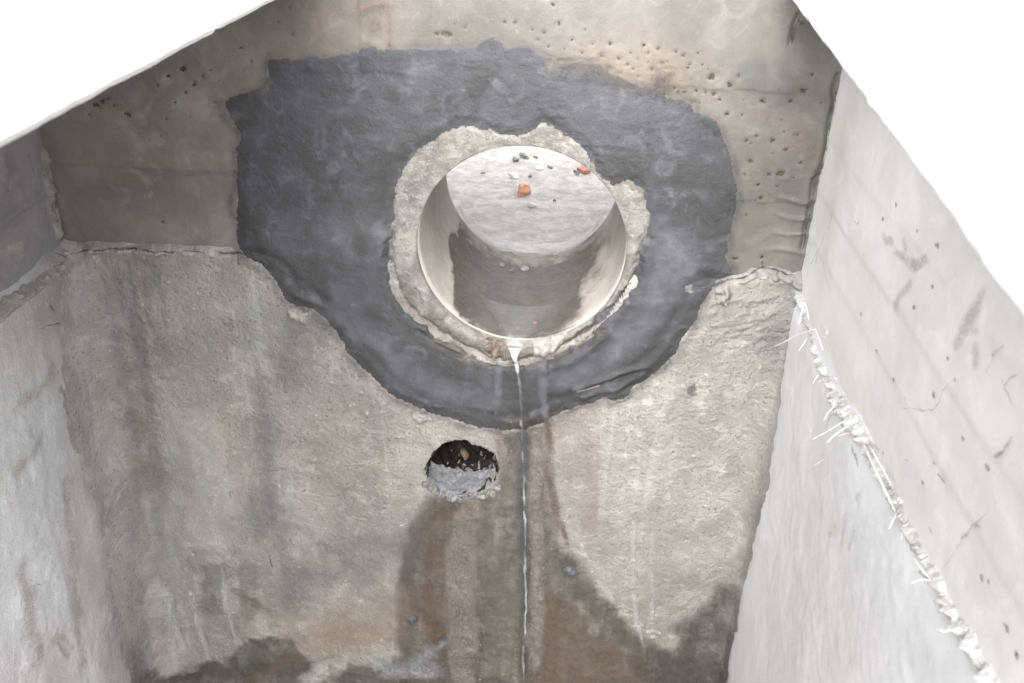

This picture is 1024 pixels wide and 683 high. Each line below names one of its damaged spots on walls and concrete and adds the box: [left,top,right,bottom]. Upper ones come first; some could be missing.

crack [57,239,313,284]
water stain [145,382,730,683]
spalling [421,428,513,683]